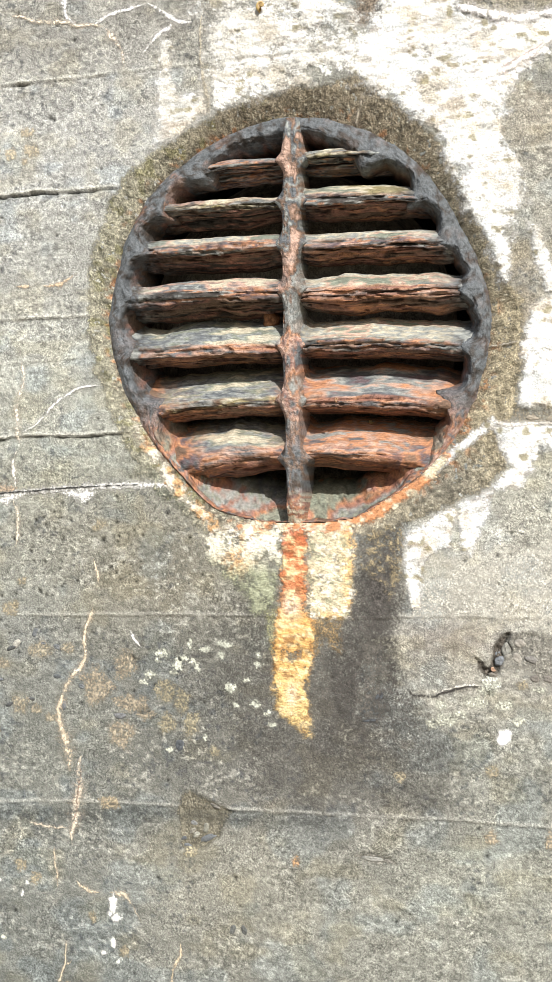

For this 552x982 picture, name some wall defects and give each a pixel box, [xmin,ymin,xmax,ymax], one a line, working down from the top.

crack [12,0,210,108]
damp [151,0,552,410]
crack [30,610,139,917]
crack [92,558,100,582]
damp [134,425,230,532]
corrosion [202,452,451,736]
damp [227,416,552,783]
spalling [426,633,552,728]